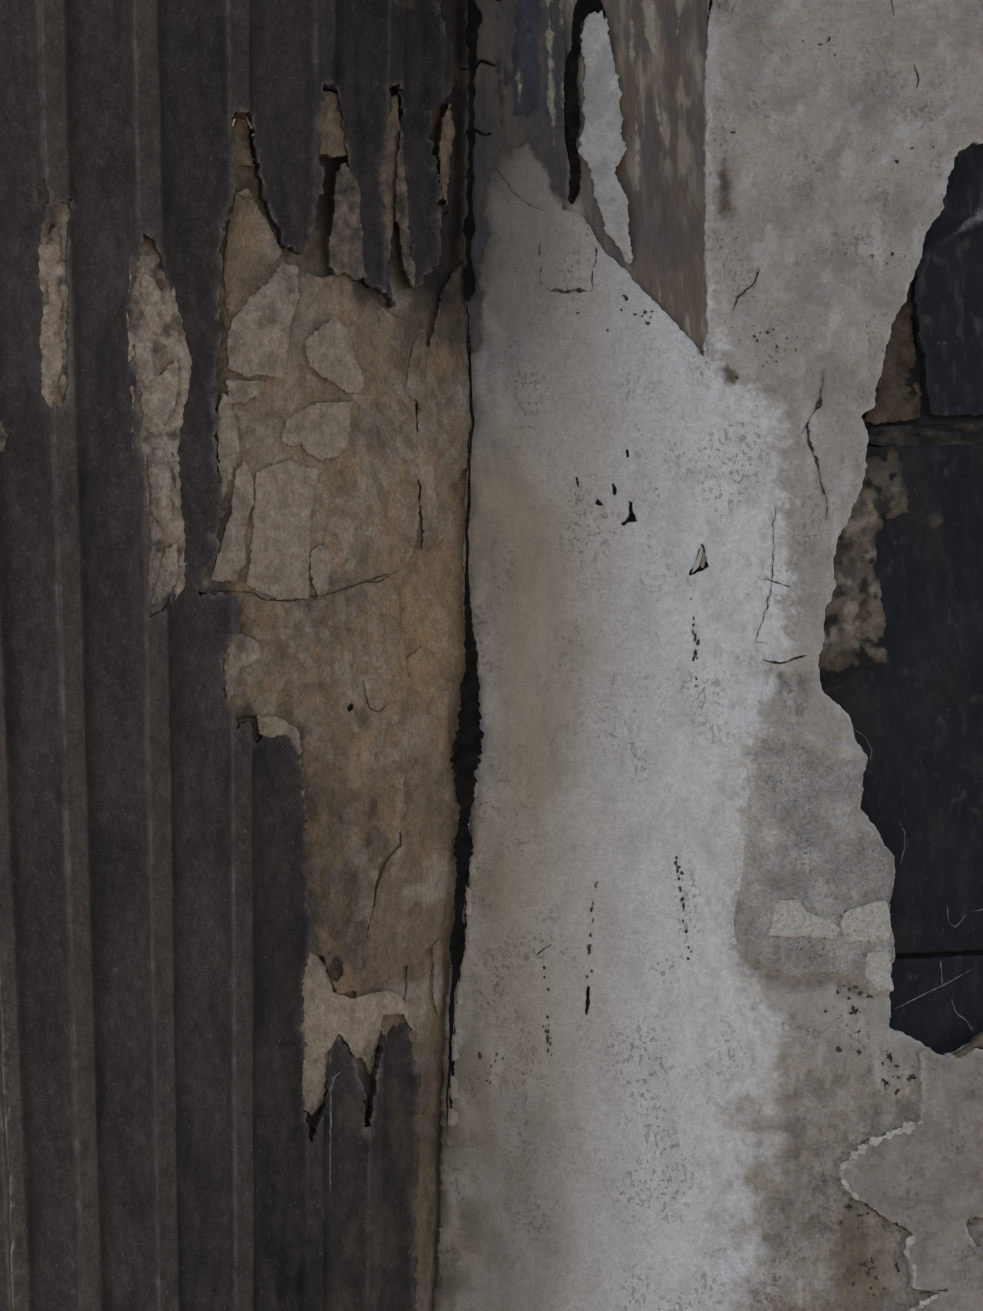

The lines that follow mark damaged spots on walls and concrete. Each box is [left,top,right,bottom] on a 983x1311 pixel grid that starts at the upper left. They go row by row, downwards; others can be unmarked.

spalling [35,177,71,414]
peeling [562,0,722,356]
spalling [863,279,922,425]
spalling [126,0,471,1311]
spalling [818,447,908,699]